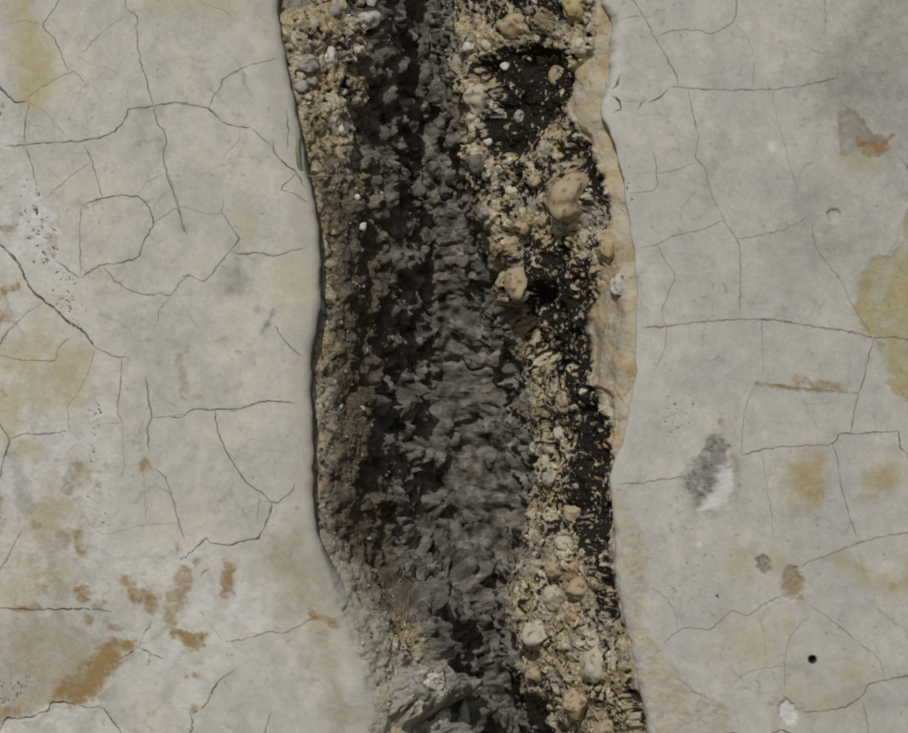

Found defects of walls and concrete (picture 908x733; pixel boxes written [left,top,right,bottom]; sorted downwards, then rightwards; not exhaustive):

crack [0,0,309,323]
peeling [844,213,908,405]
crack [0,244,300,561]
crack [279,0,908,733]
spalling [600,0,745,733]
rust [0,695,33,732]
crack [0,606,113,614]
crack [0,700,121,733]
rust [50,632,143,714]
crack [115,621,164,666]
crack [188,668,237,733]
crack [199,610,321,643]